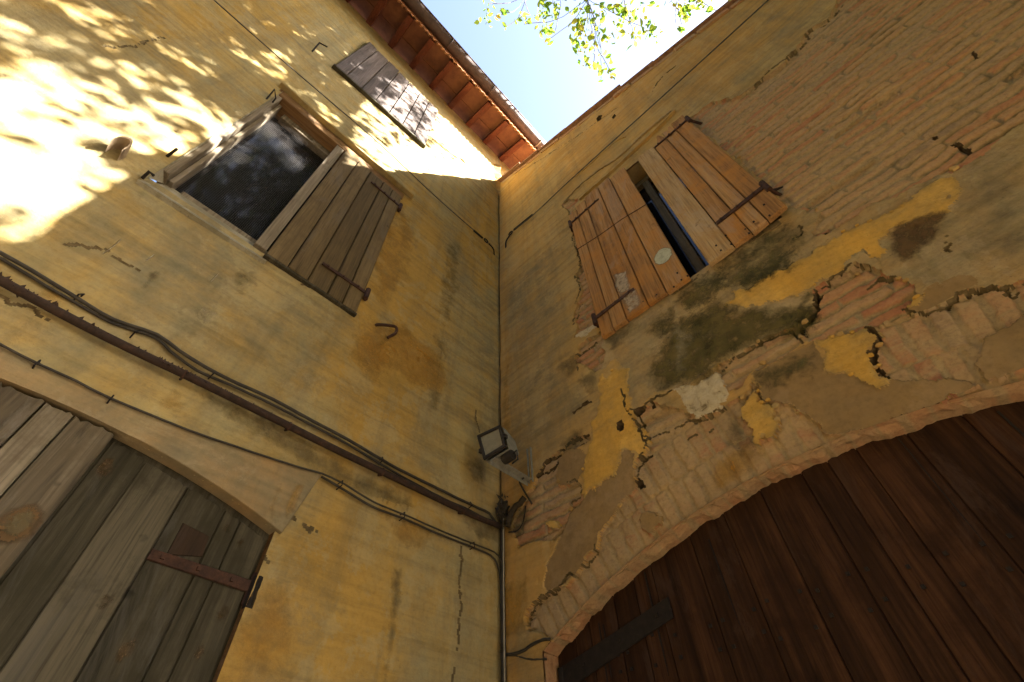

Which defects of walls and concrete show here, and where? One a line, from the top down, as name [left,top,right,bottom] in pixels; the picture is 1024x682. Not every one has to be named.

leakage [893,212,945,260]
spalling [513,0,1024,641]
leakage [672,372,729,419]
crack [451,545,464,682]